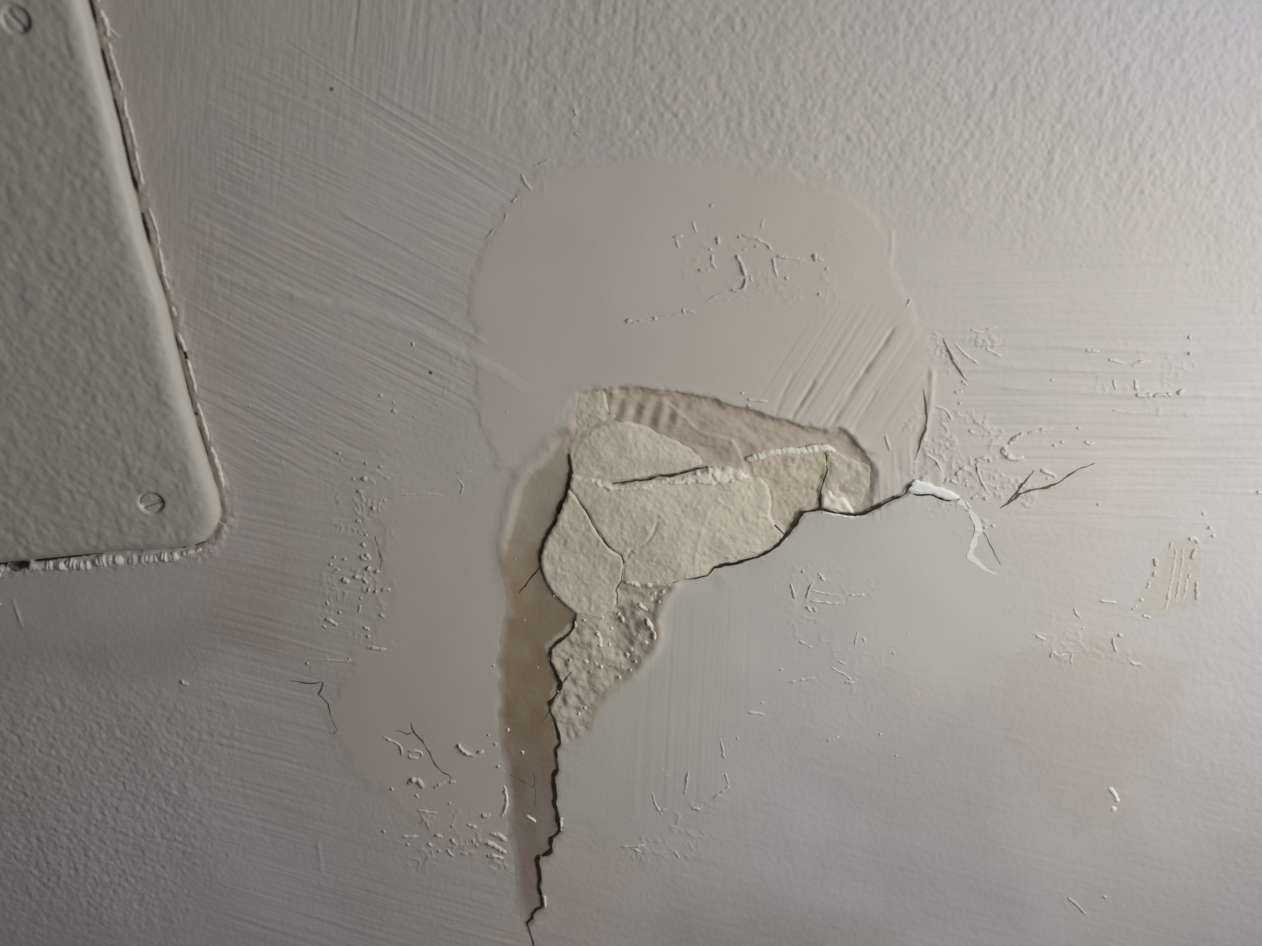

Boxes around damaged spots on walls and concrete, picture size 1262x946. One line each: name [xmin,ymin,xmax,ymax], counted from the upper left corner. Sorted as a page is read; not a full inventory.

spalling [519,384,877,752]
peeling [924,427,1064,512]
crack [501,613,577,946]